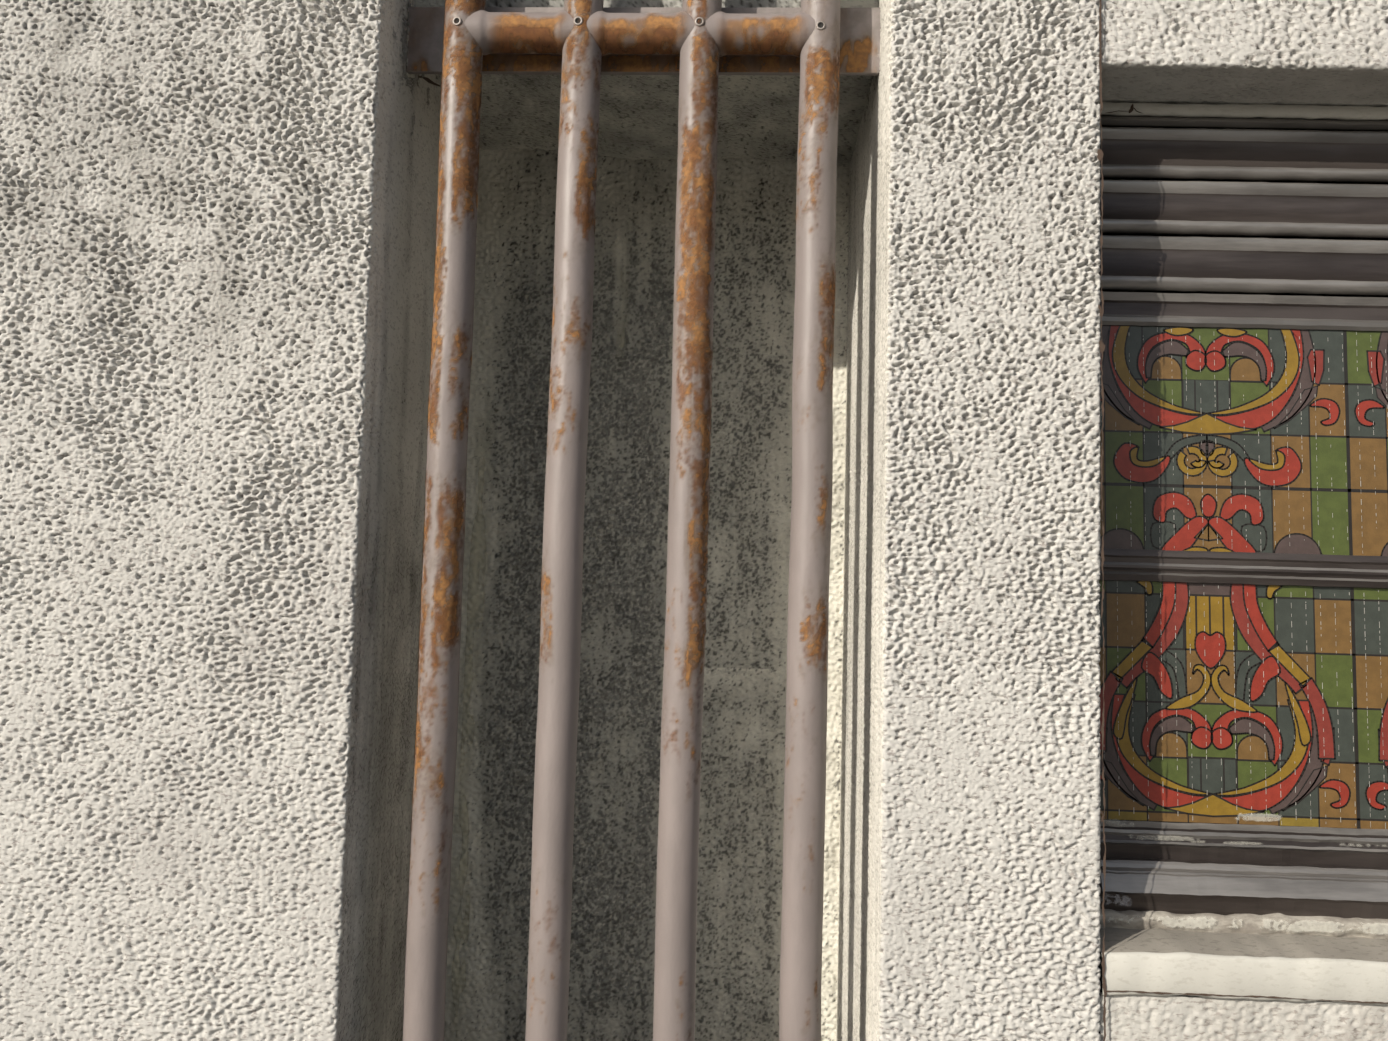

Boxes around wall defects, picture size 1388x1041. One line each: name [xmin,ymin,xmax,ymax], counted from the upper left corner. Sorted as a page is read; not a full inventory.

rust [412,687,444,803]
damp [464,145,555,1041]
damp [568,145,674,1041]
rust [412,0,872,705]
damp [695,179,794,1041]